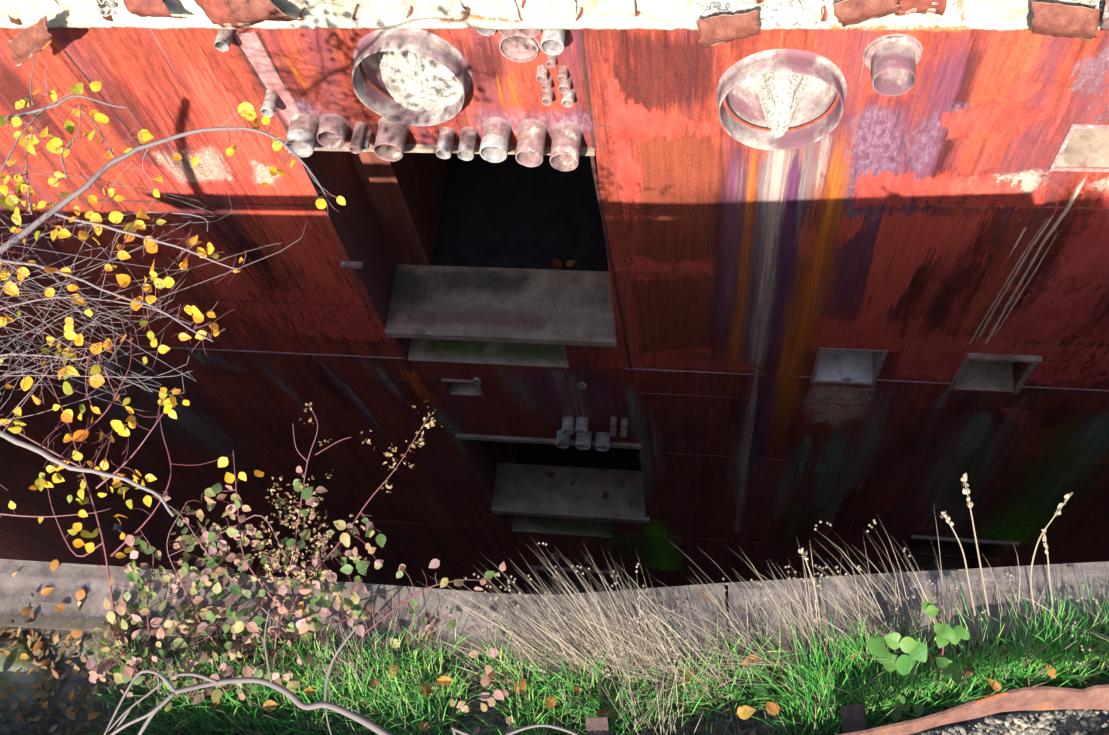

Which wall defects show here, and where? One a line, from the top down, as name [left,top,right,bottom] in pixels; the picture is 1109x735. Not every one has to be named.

spalling [86,0,129,17]
spalling [696,0,759,19]
spalling [1070,0,1105,9]
corrosion [282,54,307,111]
corrosion [459,38,519,107]
peeling [1070,48,1109,124]
peeling [601,49,727,225]
corrosion [634,133,756,370]
corrosion [774,149,845,435]
damp [713,39,985,535]
peeling [795,168,1109,389]
corrosion [838,684,1109,735]